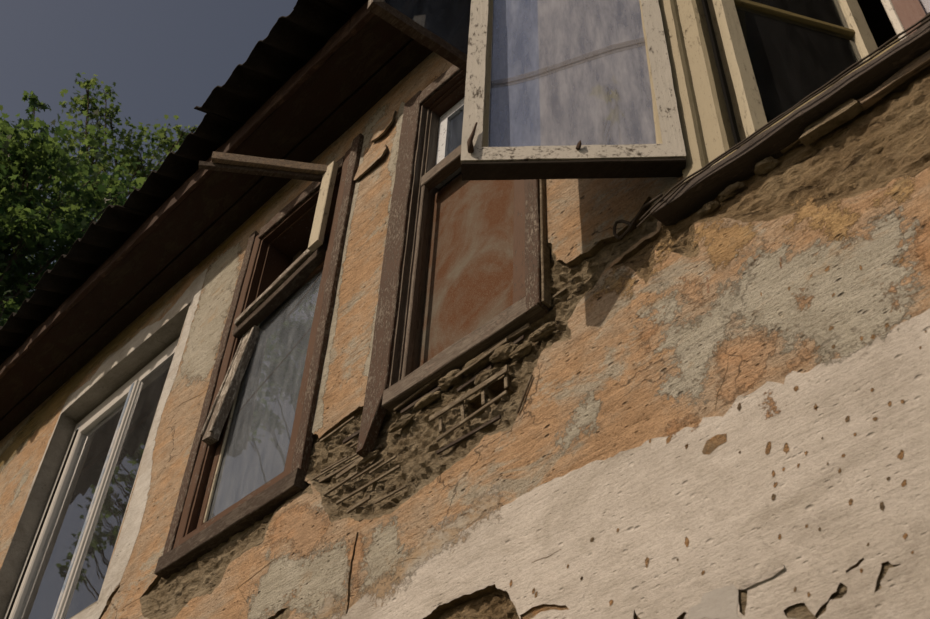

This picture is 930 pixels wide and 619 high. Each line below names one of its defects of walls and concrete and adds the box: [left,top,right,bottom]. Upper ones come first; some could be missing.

crack [346,533,359,614]
peeling [140,66,930,619]